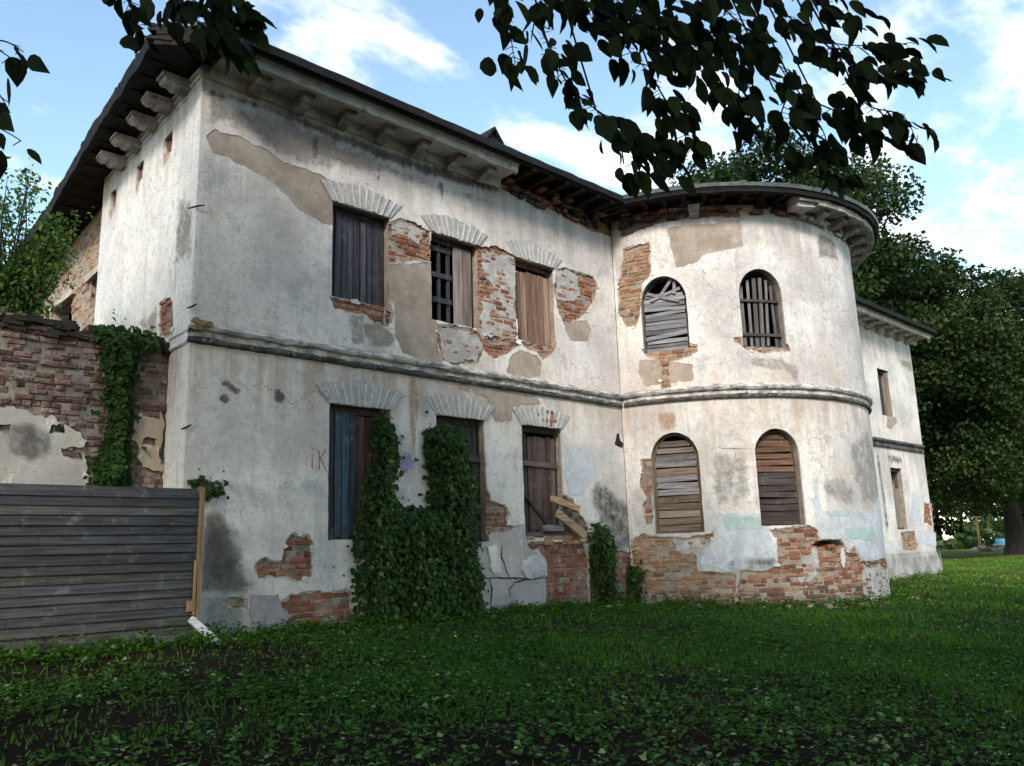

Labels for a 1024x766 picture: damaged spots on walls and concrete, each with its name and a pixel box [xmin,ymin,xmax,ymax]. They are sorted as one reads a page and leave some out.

peeling [206,103,397,226]
flaking render [140,297,175,338]
peeling [329,217,600,379]
peeling [505,183,744,328]
damp [11,425,48,457]
damp [201,514,250,631]
flaking render [254,531,354,631]
flaking render [484,486,520,541]
crack [486,550,546,607]
damp [594,486,629,548]
flaking render [527,458,890,607]